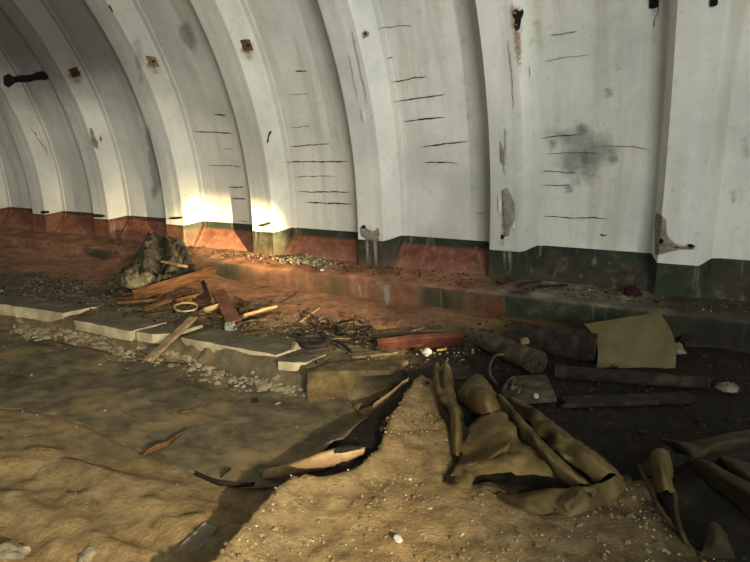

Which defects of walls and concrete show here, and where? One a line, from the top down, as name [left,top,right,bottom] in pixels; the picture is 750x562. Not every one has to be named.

rust [512,8,521,64]
crack [194,114,233,134]
crack [283,126,350,204]
crack [424,141,467,163]
crack [545,134,650,186]
spalling [360,225,380,242]
peeling [498,188,515,240]
spalling [655,213,695,255]